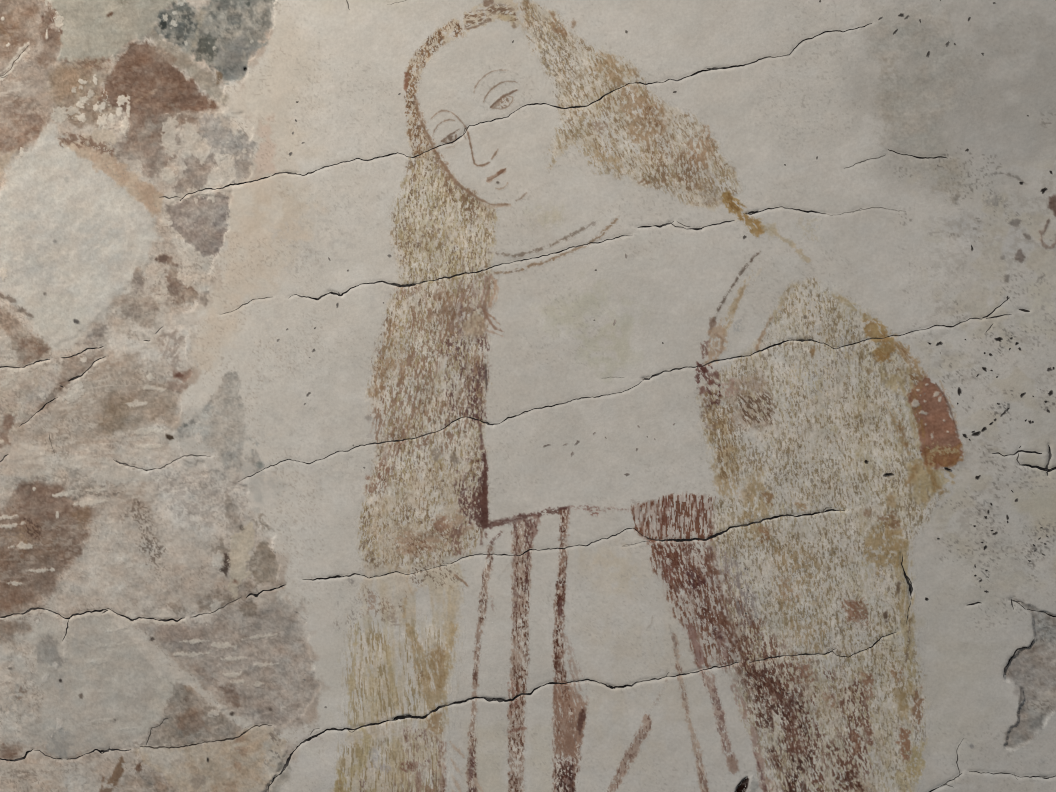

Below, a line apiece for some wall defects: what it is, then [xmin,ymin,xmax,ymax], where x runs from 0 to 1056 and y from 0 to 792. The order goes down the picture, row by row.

crack [159,23,872,199]
crack [846,149,947,168]
crack [223,206,902,314]
flaking render [95,369,266,476]
crack [238,297,1030,482]
crack [992,445,1056,475]
crack [0,718,272,761]
flaking render [0,474,327,792]
crack [0,507,845,641]
crack [268,556,913,792]
crack [929,738,1055,792]
flaking render [1002,596,1056,754]